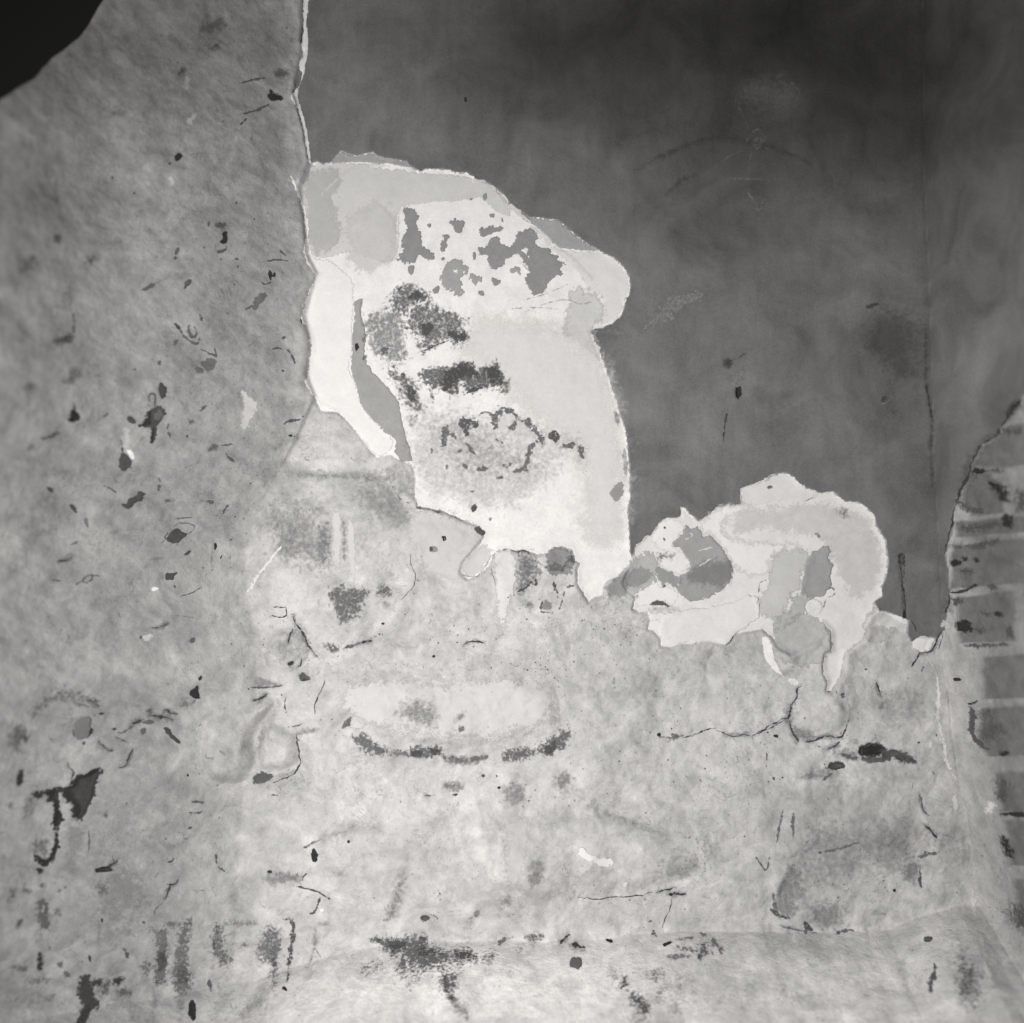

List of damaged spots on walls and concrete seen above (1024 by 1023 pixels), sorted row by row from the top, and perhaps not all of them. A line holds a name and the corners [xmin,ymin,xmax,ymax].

flaking render [290,0,943,691]
spalling [954,540,997,591]
crack [657,686,847,767]